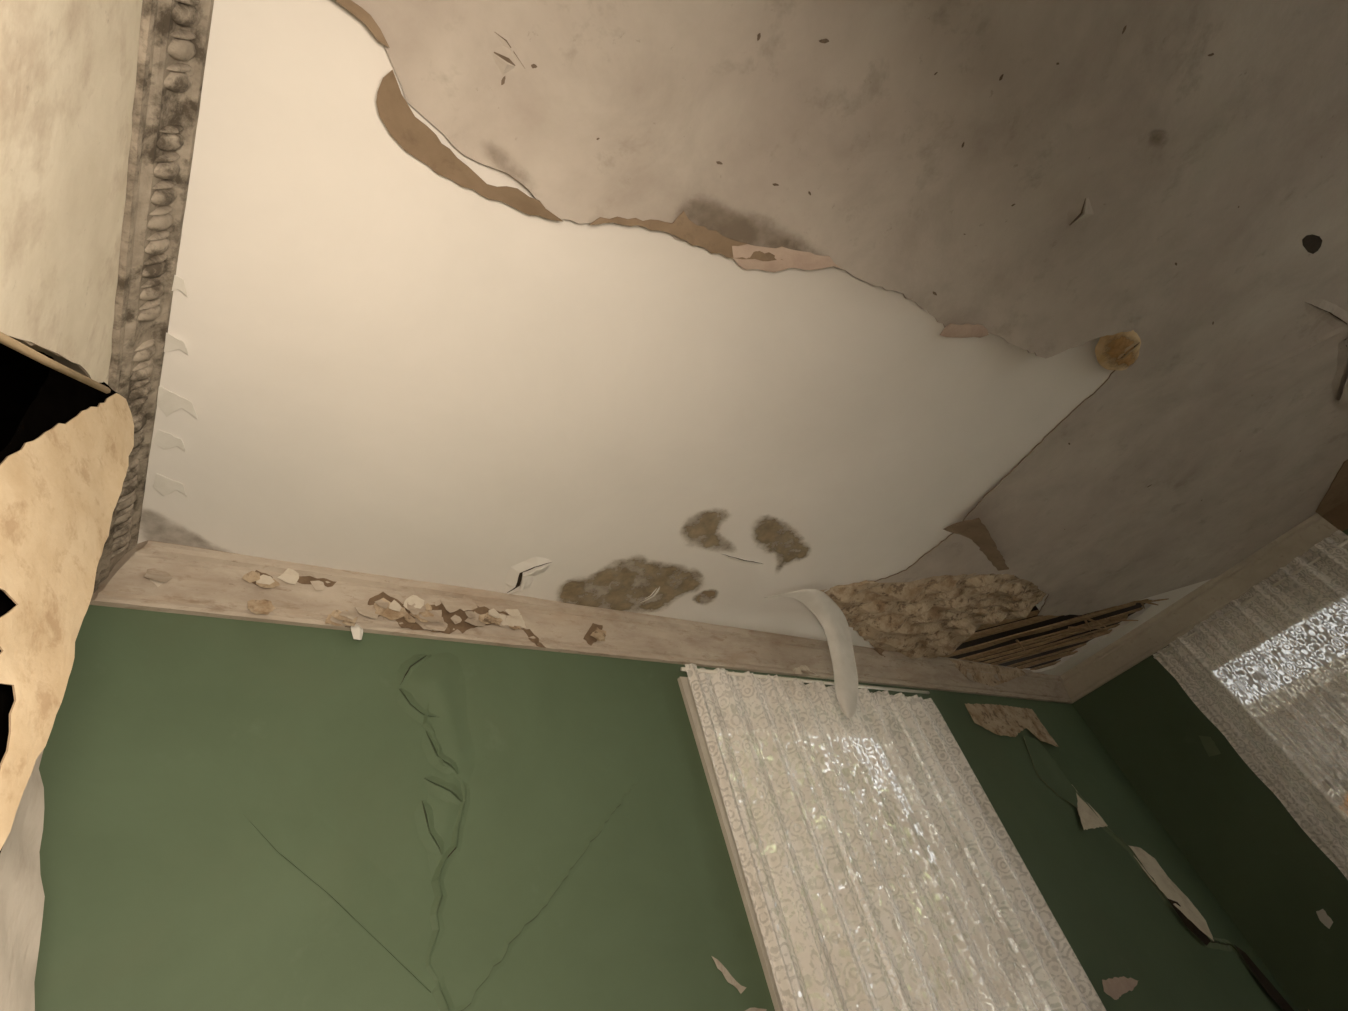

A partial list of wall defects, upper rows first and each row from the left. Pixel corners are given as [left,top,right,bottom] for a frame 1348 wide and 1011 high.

spalling [0,343,54,452]
spalling [1315,459,1348,531]
leakage [683,512,809,567]
peeling [242,568,336,615]
leakage [560,559,716,611]
peeling [325,592,546,648]
peeling [583,623,606,646]
spalling [764,573,1047,719]
peeling [965,703,1310,1011]
peeling [1316,909,1333,929]
peeling [712,956,747,994]